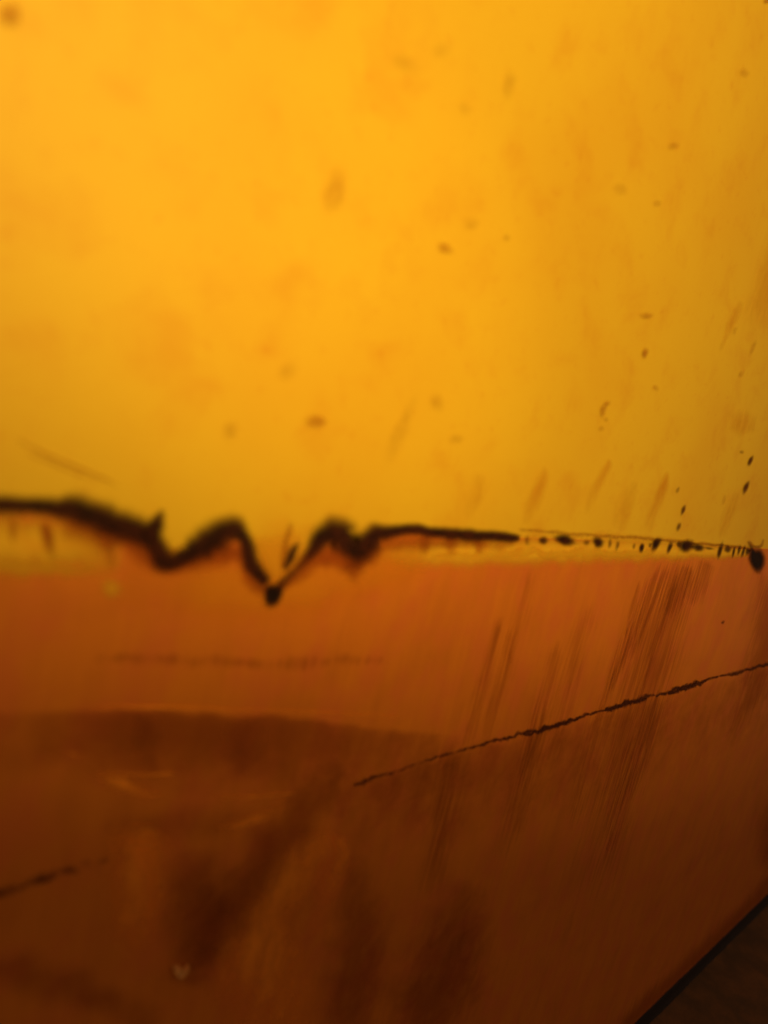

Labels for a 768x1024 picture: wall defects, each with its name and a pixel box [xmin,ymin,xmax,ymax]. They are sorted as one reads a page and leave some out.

crack [0,497,603,606]
crack [640,539,750,556]
crack [355,663,768,786]